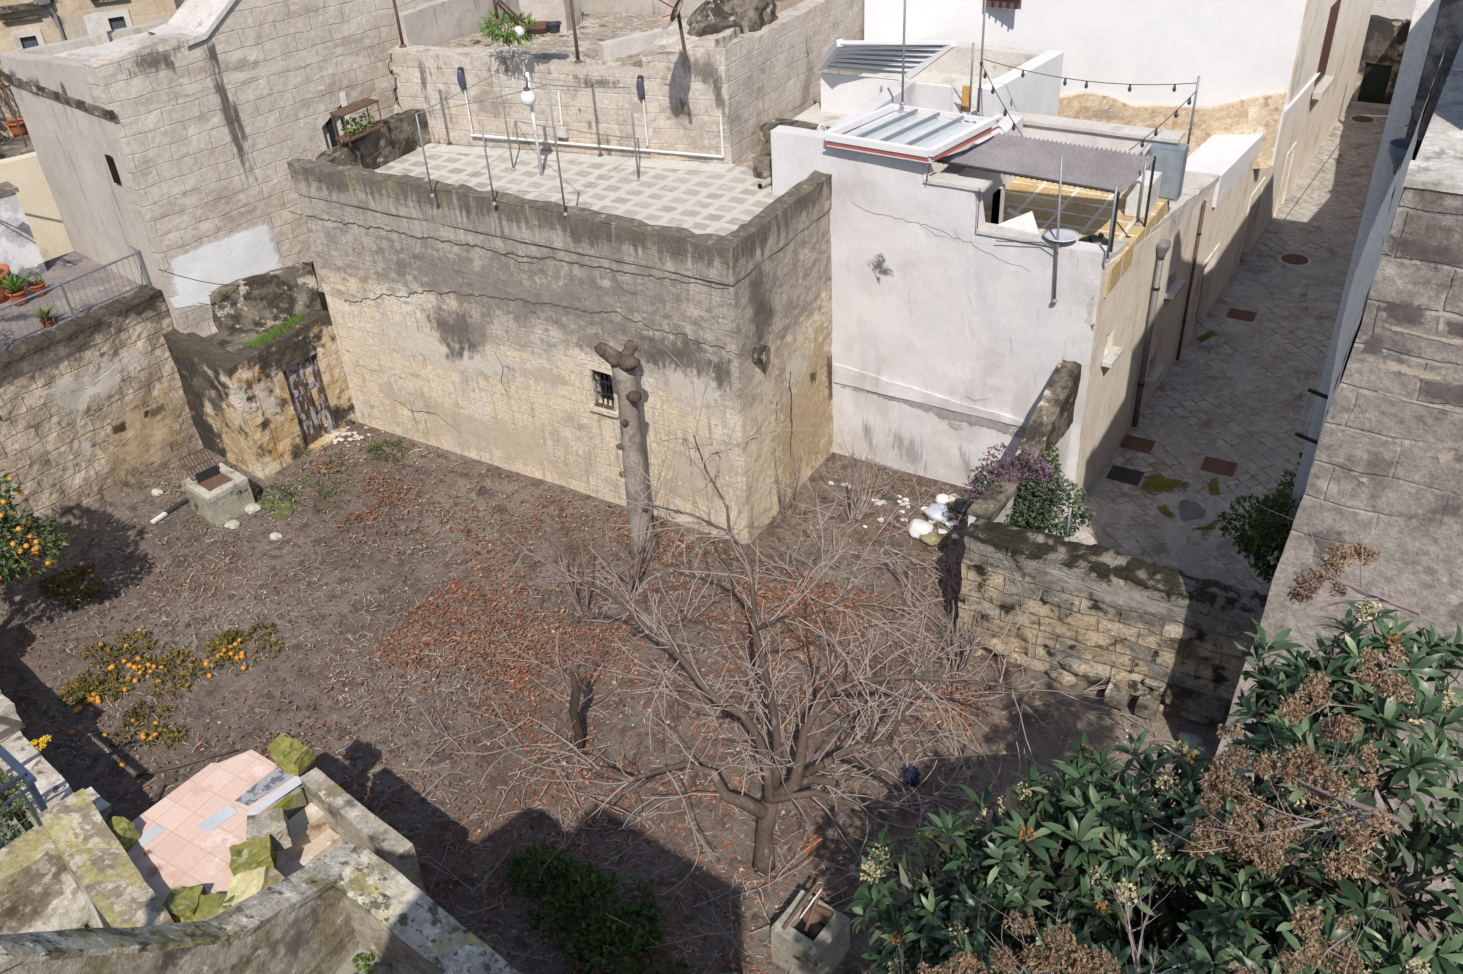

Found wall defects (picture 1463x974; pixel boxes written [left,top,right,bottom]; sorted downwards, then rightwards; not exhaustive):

water stain [362,243,665,359]
crack [289,211,744,356]
water stain [750,265,774,343]
water stain [0,881,25,931]
water stain [284,913,316,958]